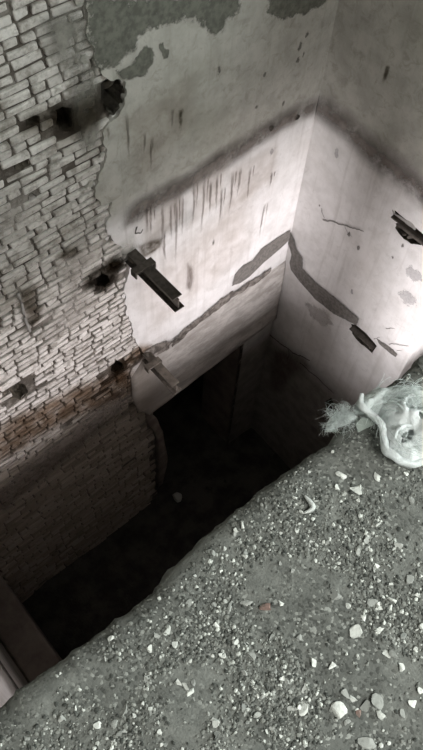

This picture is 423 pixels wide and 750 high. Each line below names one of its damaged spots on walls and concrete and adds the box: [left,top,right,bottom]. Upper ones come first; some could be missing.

flaking render [267,0,326,20]
crack [321,208,364,237]
flaking render [0,0,291,660]
spalling [349,323,397,357]